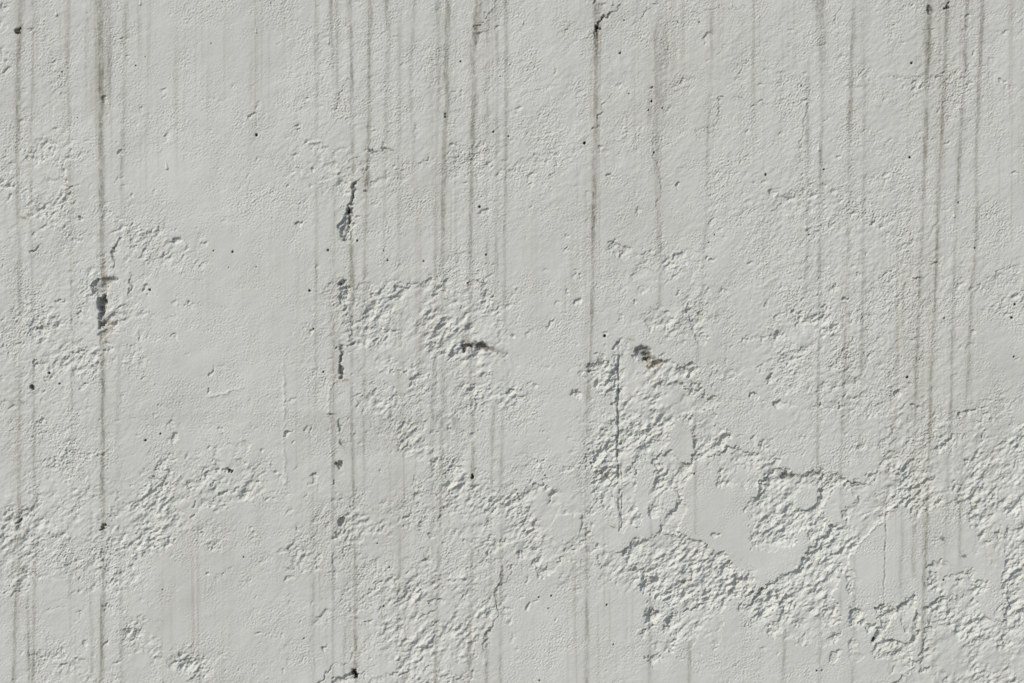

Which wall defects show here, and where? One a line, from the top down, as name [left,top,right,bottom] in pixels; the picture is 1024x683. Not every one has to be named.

peeling [98,432,277,562]
crack [608,338,624,533]
spalling [340,268,1024,683]